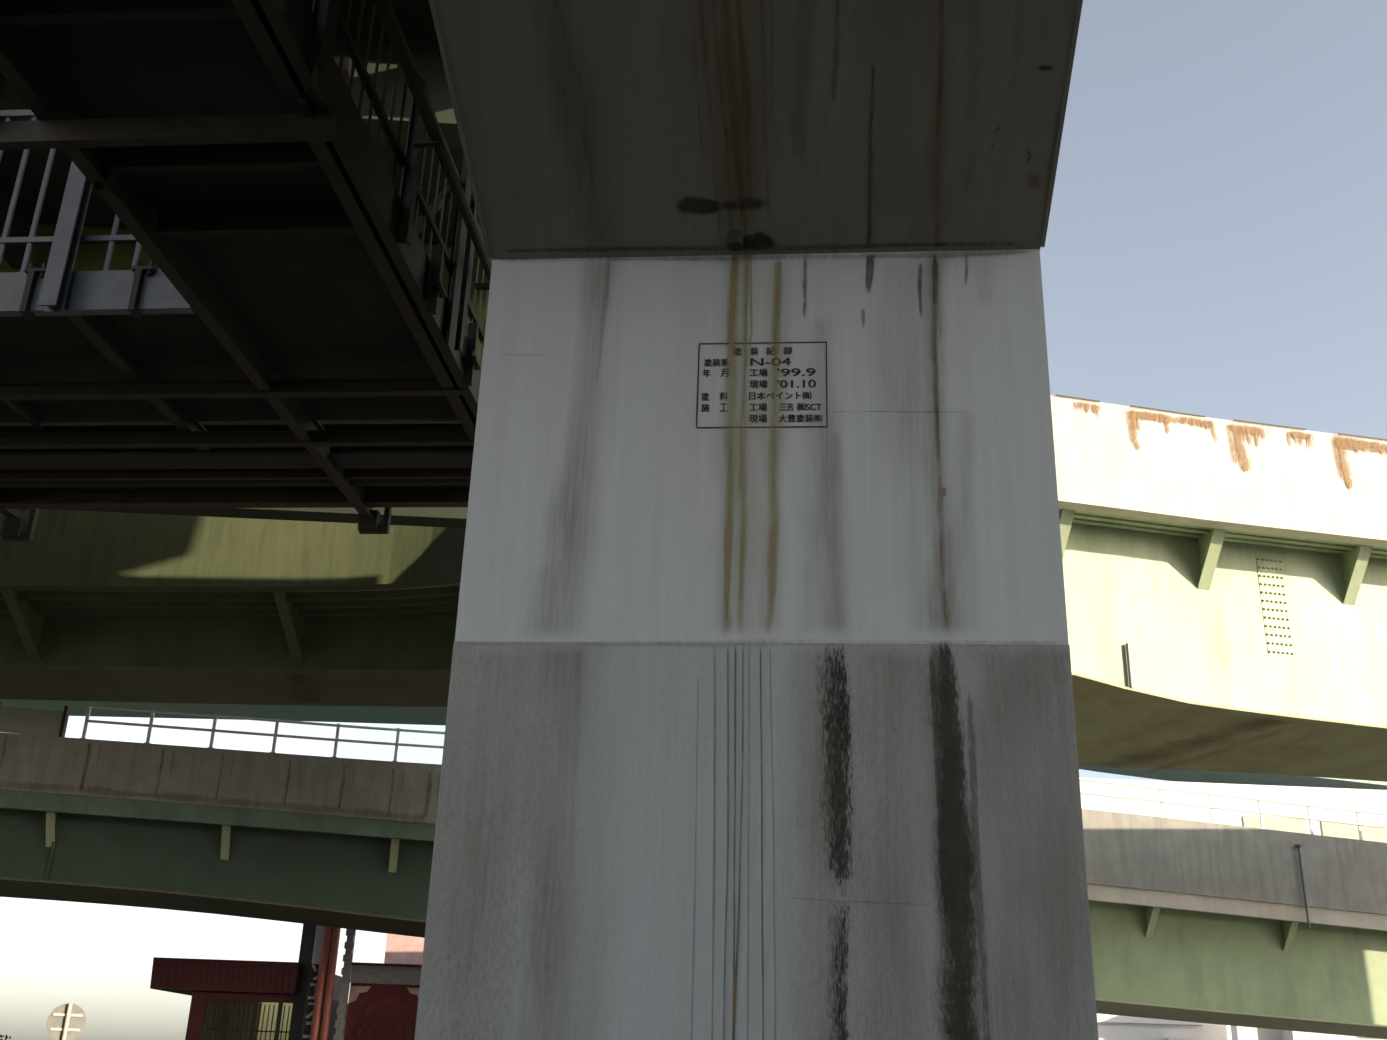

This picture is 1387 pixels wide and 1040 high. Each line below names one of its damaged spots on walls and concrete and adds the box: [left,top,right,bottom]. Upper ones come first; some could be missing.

rust [729,258,752,380]
rust [1075,402,1100,416]
rust [1126,410,1269,472]
rust [1288,431,1313,447]
rust [1333,435,1387,489]
rust [724,438,745,624]
rust [769,456,777,609]
water stain [822,644,854,1040]
water stain [930,644,989,1040]